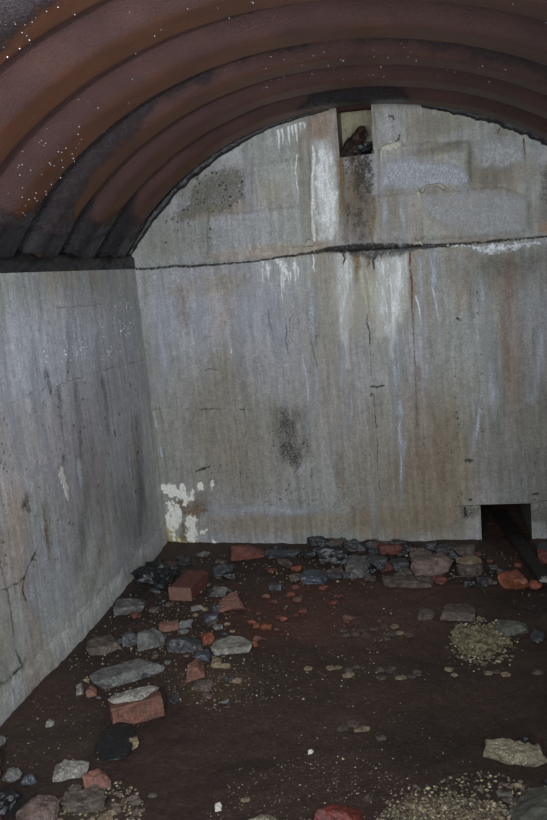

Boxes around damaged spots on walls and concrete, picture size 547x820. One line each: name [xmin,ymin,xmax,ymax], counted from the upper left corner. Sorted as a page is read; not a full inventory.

leakage [276,122,306,148]
leakage [298,86,411,111]
crack [136,236,547,354]
leakage [295,139,547,482]